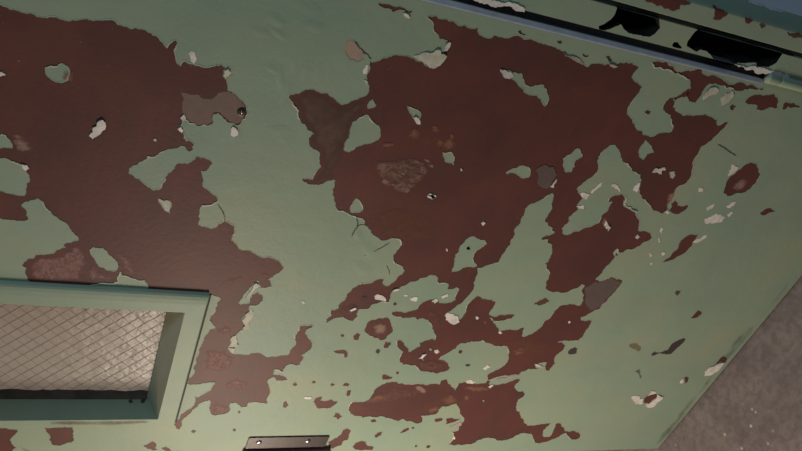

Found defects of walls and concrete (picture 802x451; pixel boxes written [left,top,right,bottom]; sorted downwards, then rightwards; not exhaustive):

peeling [378,3,413,18]
peeling [645,0,690,11]
peeling [713,5,728,20]
peeling [0,3,314,430]
peeling [287,15,801,446]
peeling [0,428,18,451]
peeling [44,427,74,446]
peeling [143,441,172,451]
peeling [328,428,383,451]